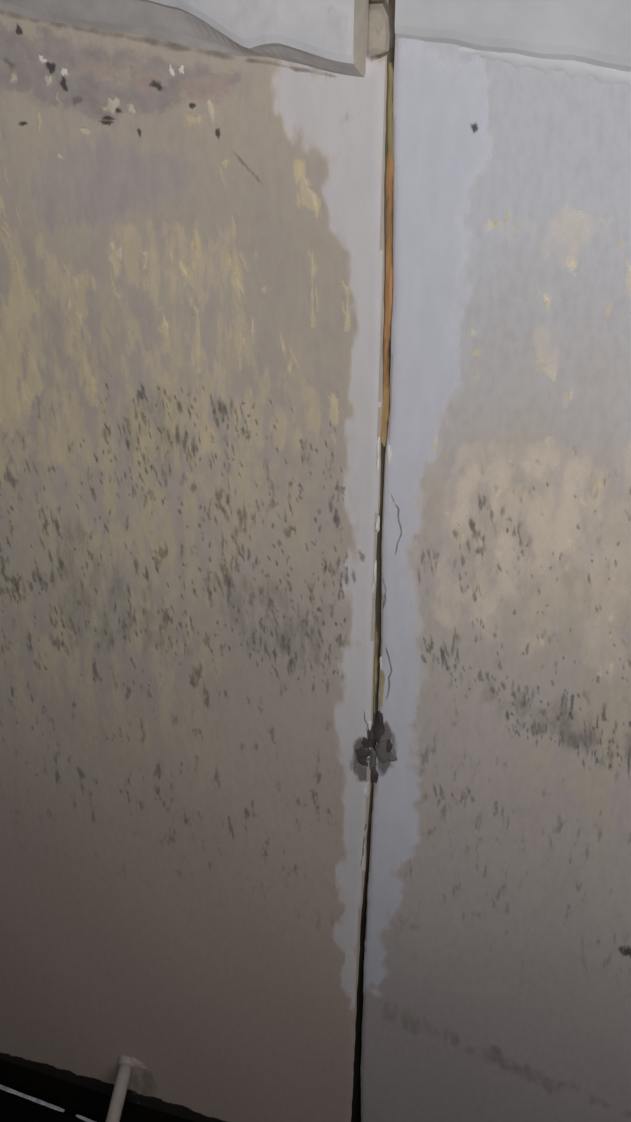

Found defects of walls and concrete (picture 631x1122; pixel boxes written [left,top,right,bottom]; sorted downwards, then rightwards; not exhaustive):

flaking render [0,25,241,139]
spalling [353,711,397,783]